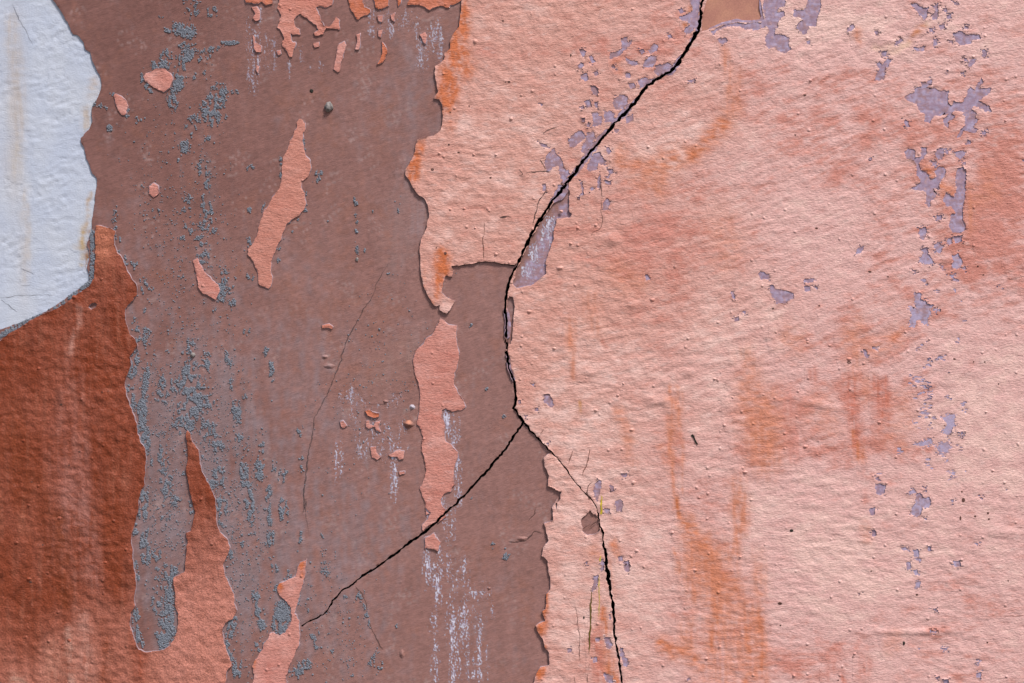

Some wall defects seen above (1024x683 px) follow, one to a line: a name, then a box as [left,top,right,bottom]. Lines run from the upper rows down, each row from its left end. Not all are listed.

peeling [0,0,686,683]
crack [303,0,704,683]
flaking render [678,0,822,53]
peeling [758,271,819,309]
peeling [874,0,992,328]